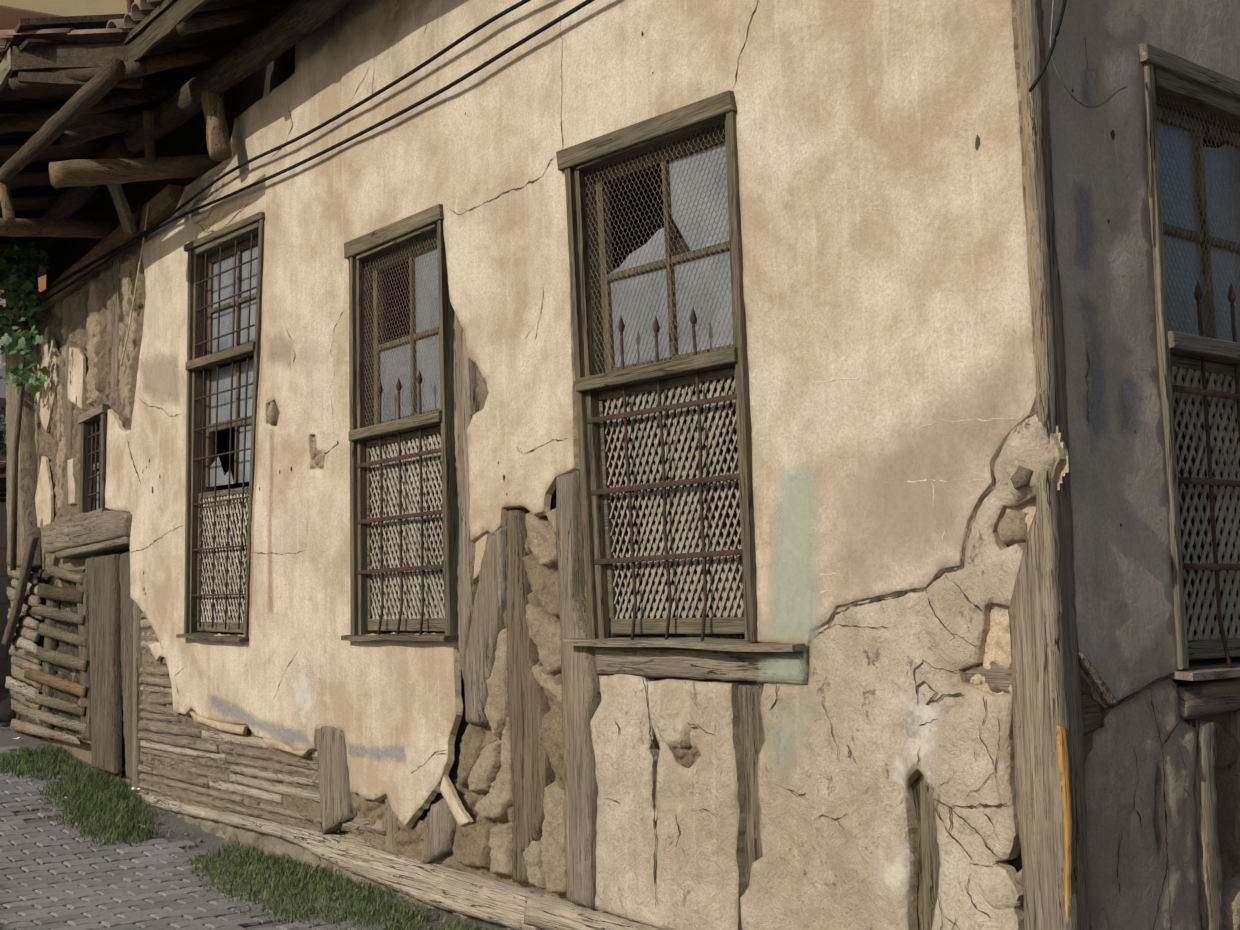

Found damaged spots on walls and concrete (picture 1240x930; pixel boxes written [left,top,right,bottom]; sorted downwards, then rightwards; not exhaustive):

crack [446,21,563,215]
crack [733,1,758,88]
spalling [32,244,146,531]
spalling [140,618,321,827]
spalling [348,461,566,899]
crack [776,784,847,831]
crack [808,412,1036,930]
spalling [1182,711,1240,930]